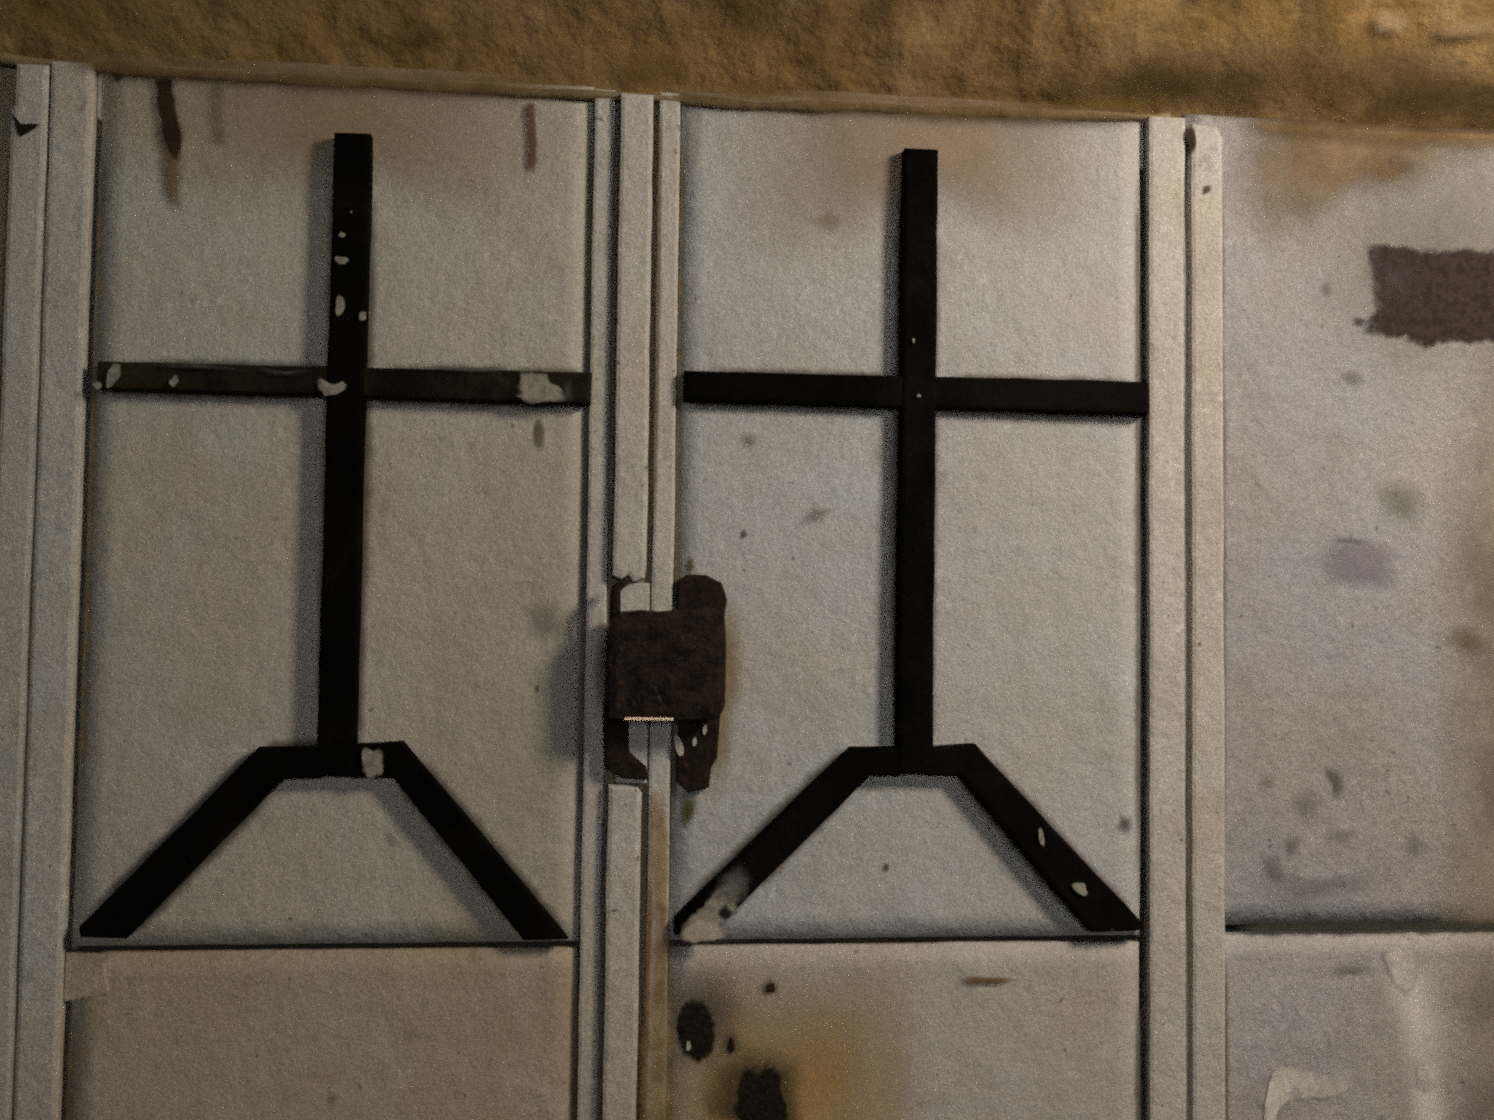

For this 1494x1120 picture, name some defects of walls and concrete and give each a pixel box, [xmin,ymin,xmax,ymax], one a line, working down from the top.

corrosion [156,76,181,204]
peeling [1357,245,1494,347]
corrosion [718,632,734,753]
corrosion [683,800,694,822]
corrosion [641,792,670,1120]
corrosion [711,1035,894,1120]